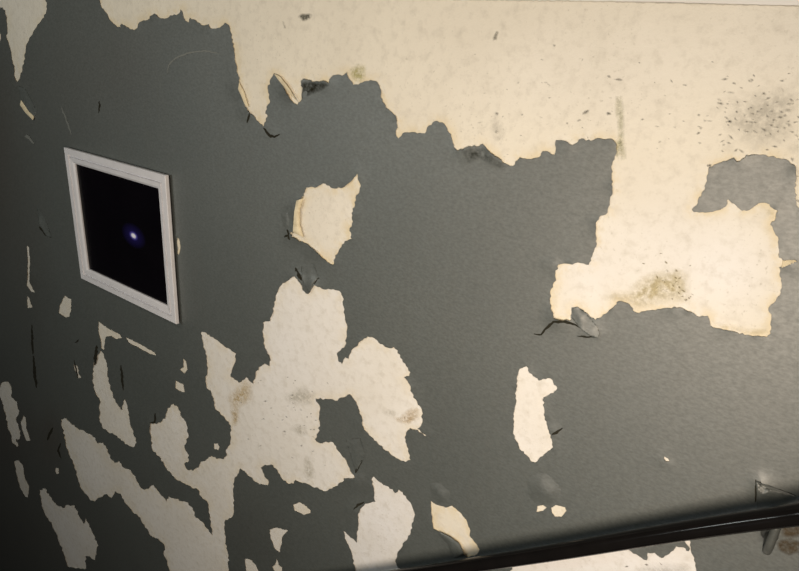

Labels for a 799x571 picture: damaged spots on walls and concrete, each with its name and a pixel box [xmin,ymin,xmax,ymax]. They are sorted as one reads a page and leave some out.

peeling [100,0,799,338]
peeling [59,296,71,318]
peeling [0,382,30,447]
peeling [61,263,426,571]
peeling [513,366,557,462]
peeling [14,460,29,497]
peeling [40,488,98,569]
peeling [431,501,480,558]
peeling [536,505,566,517]
peeling [510,541,696,571]